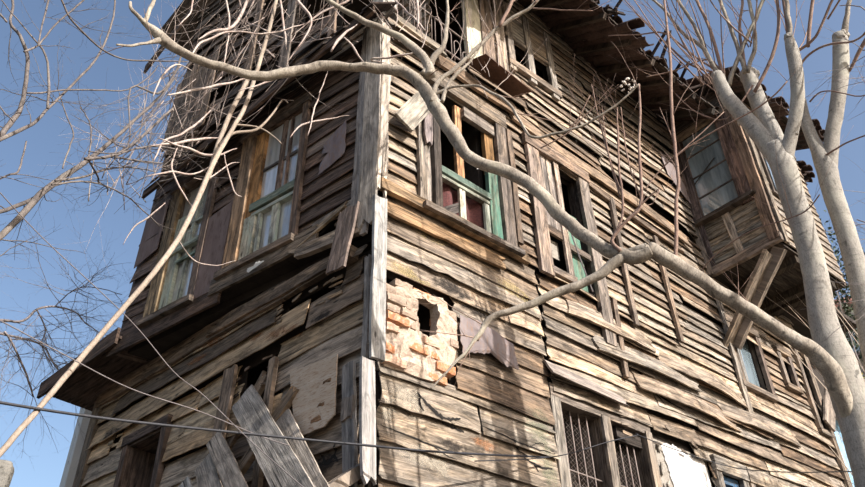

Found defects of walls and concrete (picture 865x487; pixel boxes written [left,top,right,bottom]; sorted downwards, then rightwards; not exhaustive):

spalling [373,278,459,386]
crack [382,393,555,472]